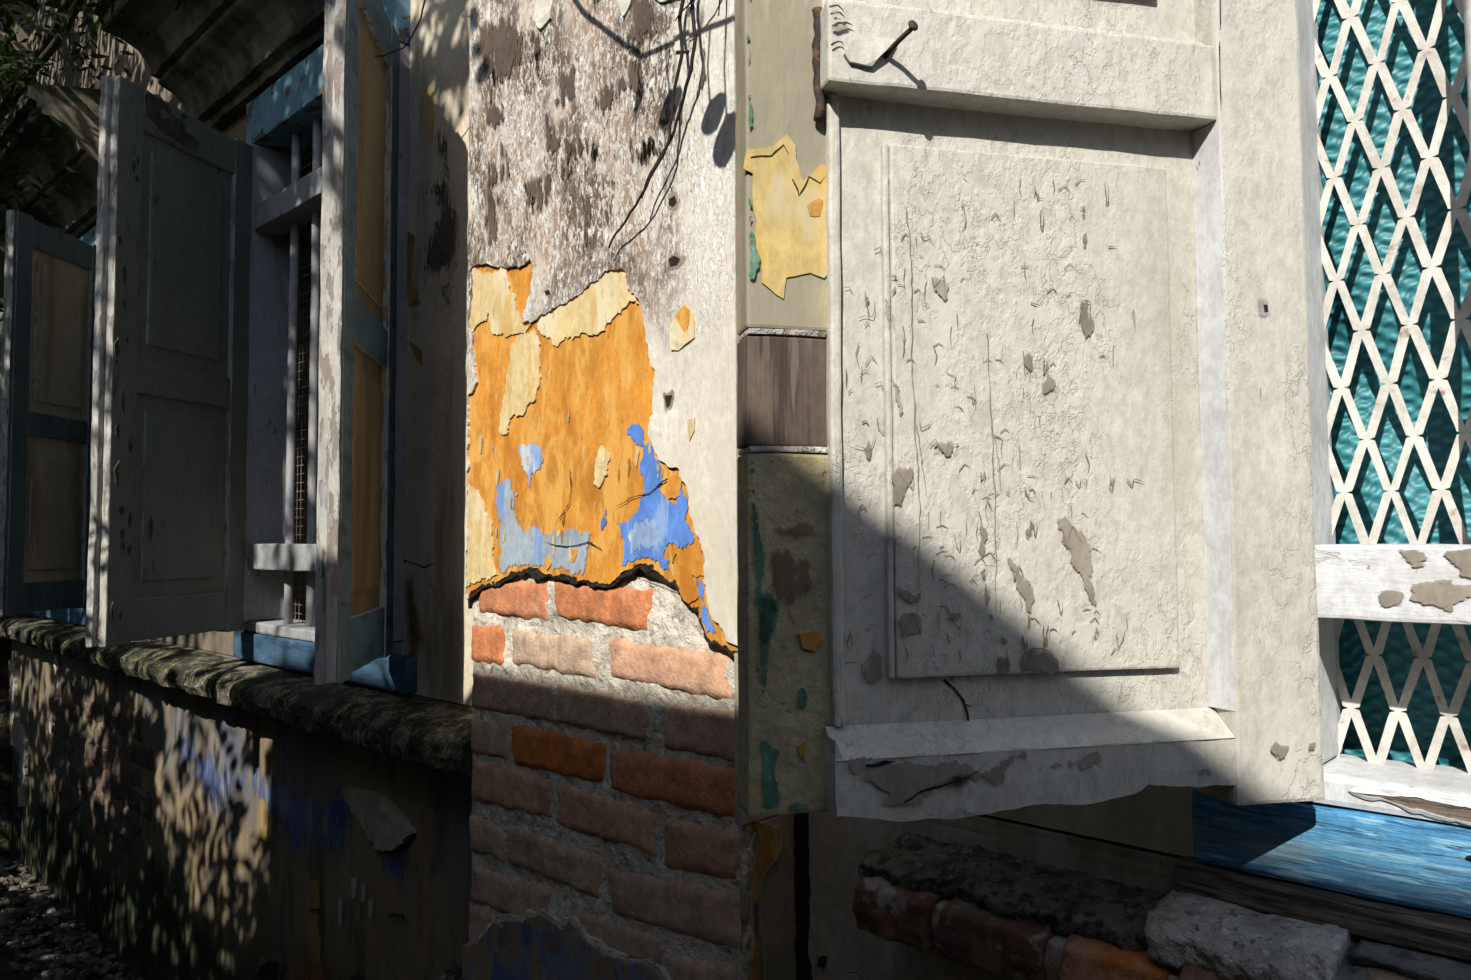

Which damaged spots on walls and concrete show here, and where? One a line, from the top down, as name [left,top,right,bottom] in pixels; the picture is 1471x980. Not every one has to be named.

leakage [477,15,601,252]
leakage [590,0,656,116]
leakage [627,100,686,166]
leakage [581,195,611,249]
spalling [665,252,686,270]
peeling [743,135,827,299]
peeling [891,233,977,413]
peeling [1031,287,1094,337]
flaking render [465,267,754,980]
peeling [891,418,1128,676]
peeling [1377,548,1471,611]
flaking render [8,655,154,855]